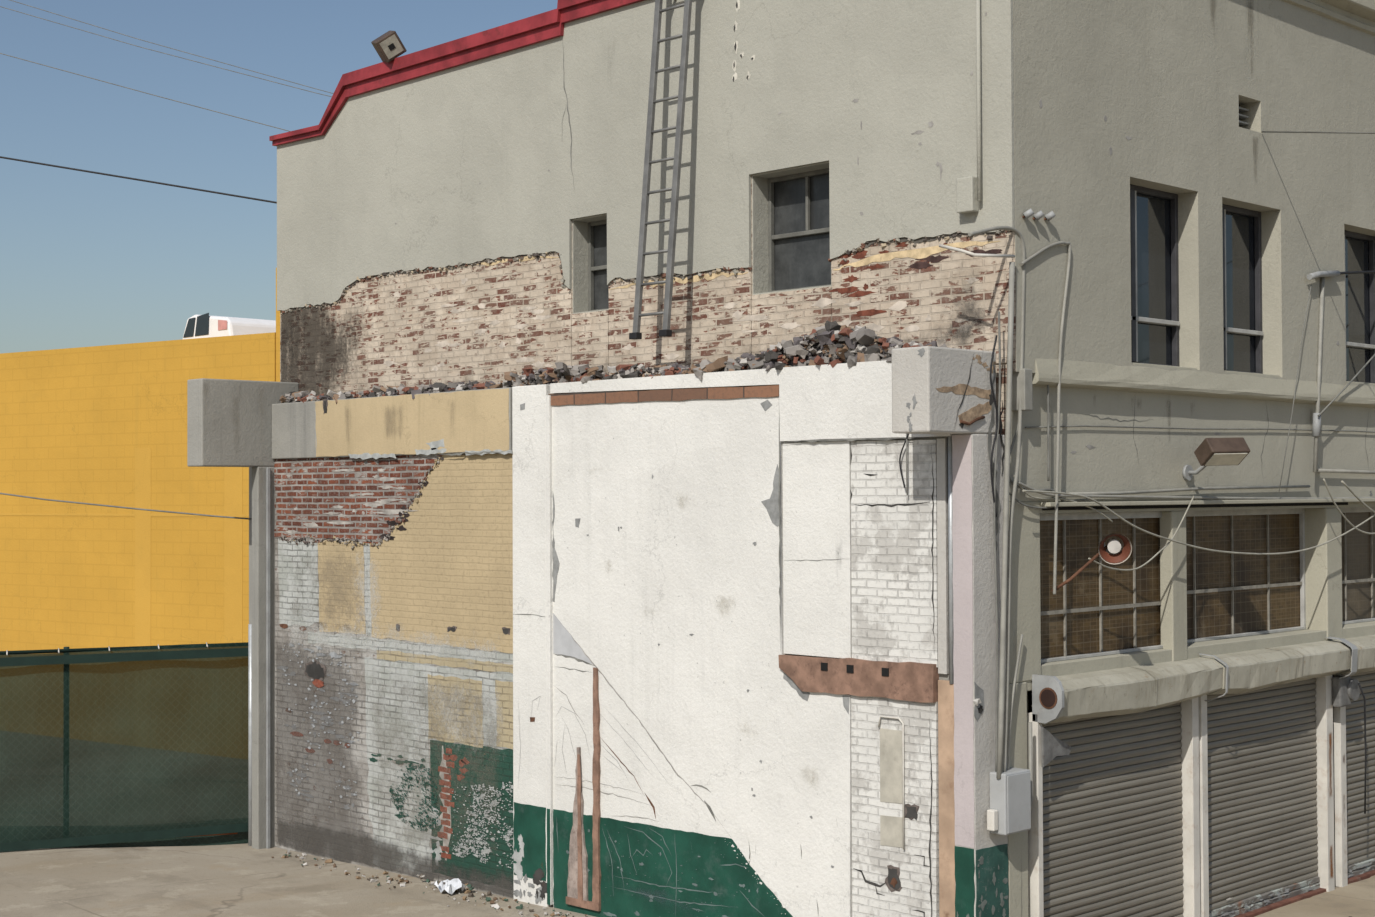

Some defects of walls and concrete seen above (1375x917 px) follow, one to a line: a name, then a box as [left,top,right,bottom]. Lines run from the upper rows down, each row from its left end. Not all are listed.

crack [562,38,575,190]
flaking render [280,230,1015,432]
spalling [274,439,446,550]
flaking render [761,464,781,527]
spalling [369,746,551,904]
peeling [957,854,1008,917]